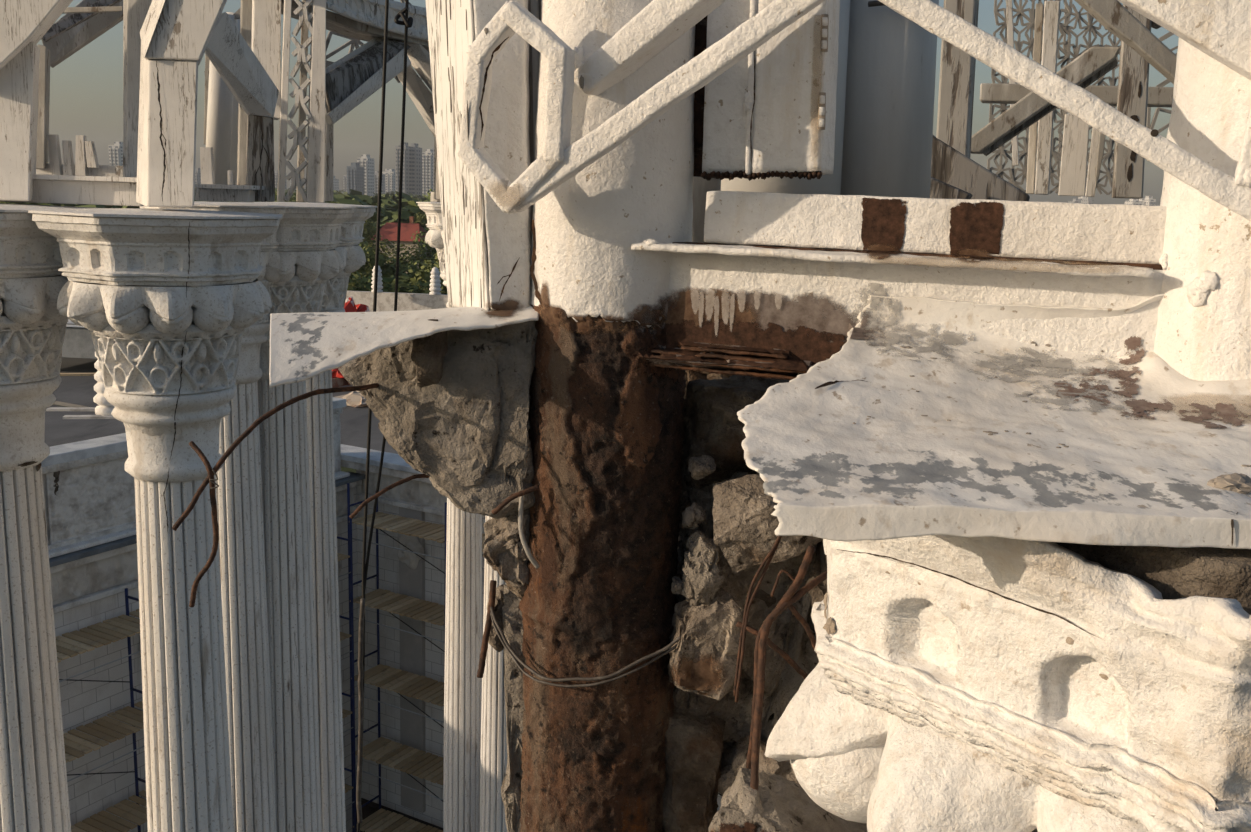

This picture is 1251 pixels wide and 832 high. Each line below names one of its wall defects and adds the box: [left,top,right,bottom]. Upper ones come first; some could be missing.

crack [156,61,166,201]
crack [184,222,192,296]
rust [861,198,907,259]
rust [949,202,1004,262]
peeling [851,283,1248,428]
crack [163,335,186,532]
spalling [349,474,430,519]
crack [837,549,1097,637]
spalling [733,536,835,791]
rust [711,822,766,832]